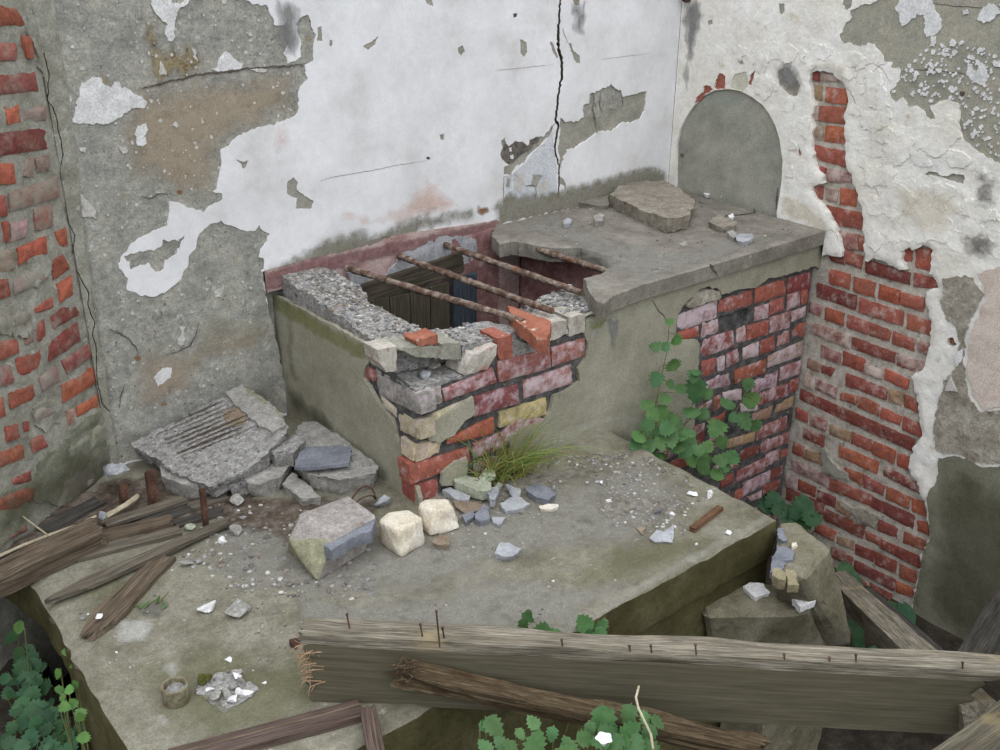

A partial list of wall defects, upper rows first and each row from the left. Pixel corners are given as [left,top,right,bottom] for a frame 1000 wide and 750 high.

crack [44,55,63,166]
crack [64,208,109,411]
peeling [54,0,332,464]
flaking render [364,306,585,502]
crack [547,0,580,193]
spalling [500,85,646,203]
flaking render [653,0,1000,606]